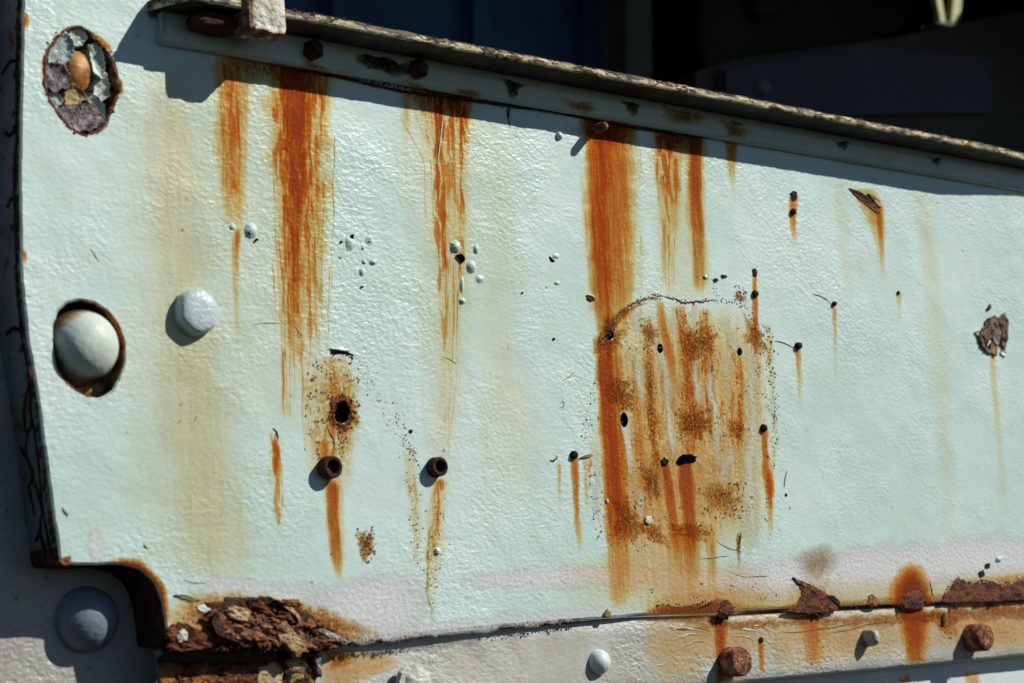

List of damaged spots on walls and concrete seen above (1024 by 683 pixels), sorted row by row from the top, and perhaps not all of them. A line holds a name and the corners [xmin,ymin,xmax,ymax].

peeling [975,304,1009,357]
corrosion [305,345,450,609]
corrosion [581,286,780,552]
corrosion [123,562,429,683]
corrosion [650,582,749,644]
corrosion [752,556,1024,640]